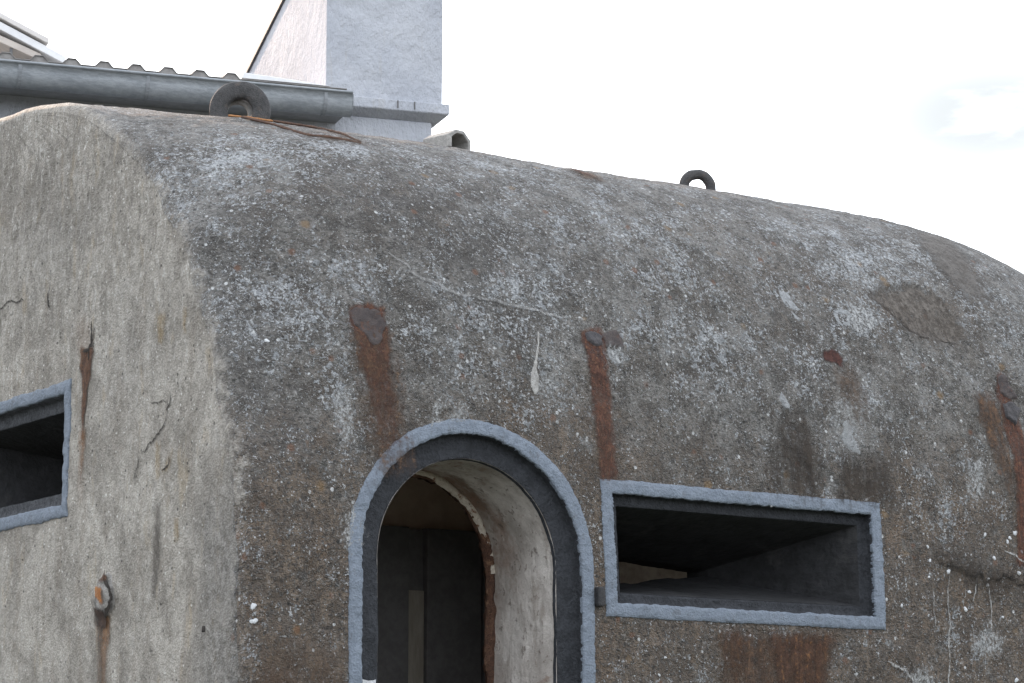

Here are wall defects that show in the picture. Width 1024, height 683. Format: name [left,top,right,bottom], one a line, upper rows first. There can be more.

corrosion [79,346,93,479]
crack [134,400,170,477]
corrosion [348,302,414,469]
corrosion [582,328,624,480]
corrosion [823,349,861,417]
corrosion [977,374,1024,566]
corrosion [97,616,109,683]